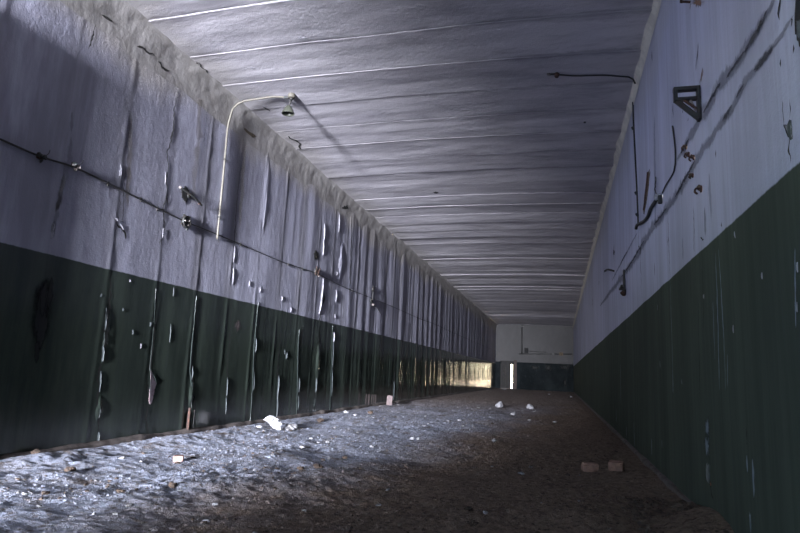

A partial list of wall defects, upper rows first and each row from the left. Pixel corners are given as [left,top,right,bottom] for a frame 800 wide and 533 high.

crack [160,92,178,244]
peeling [145,289,157,434]